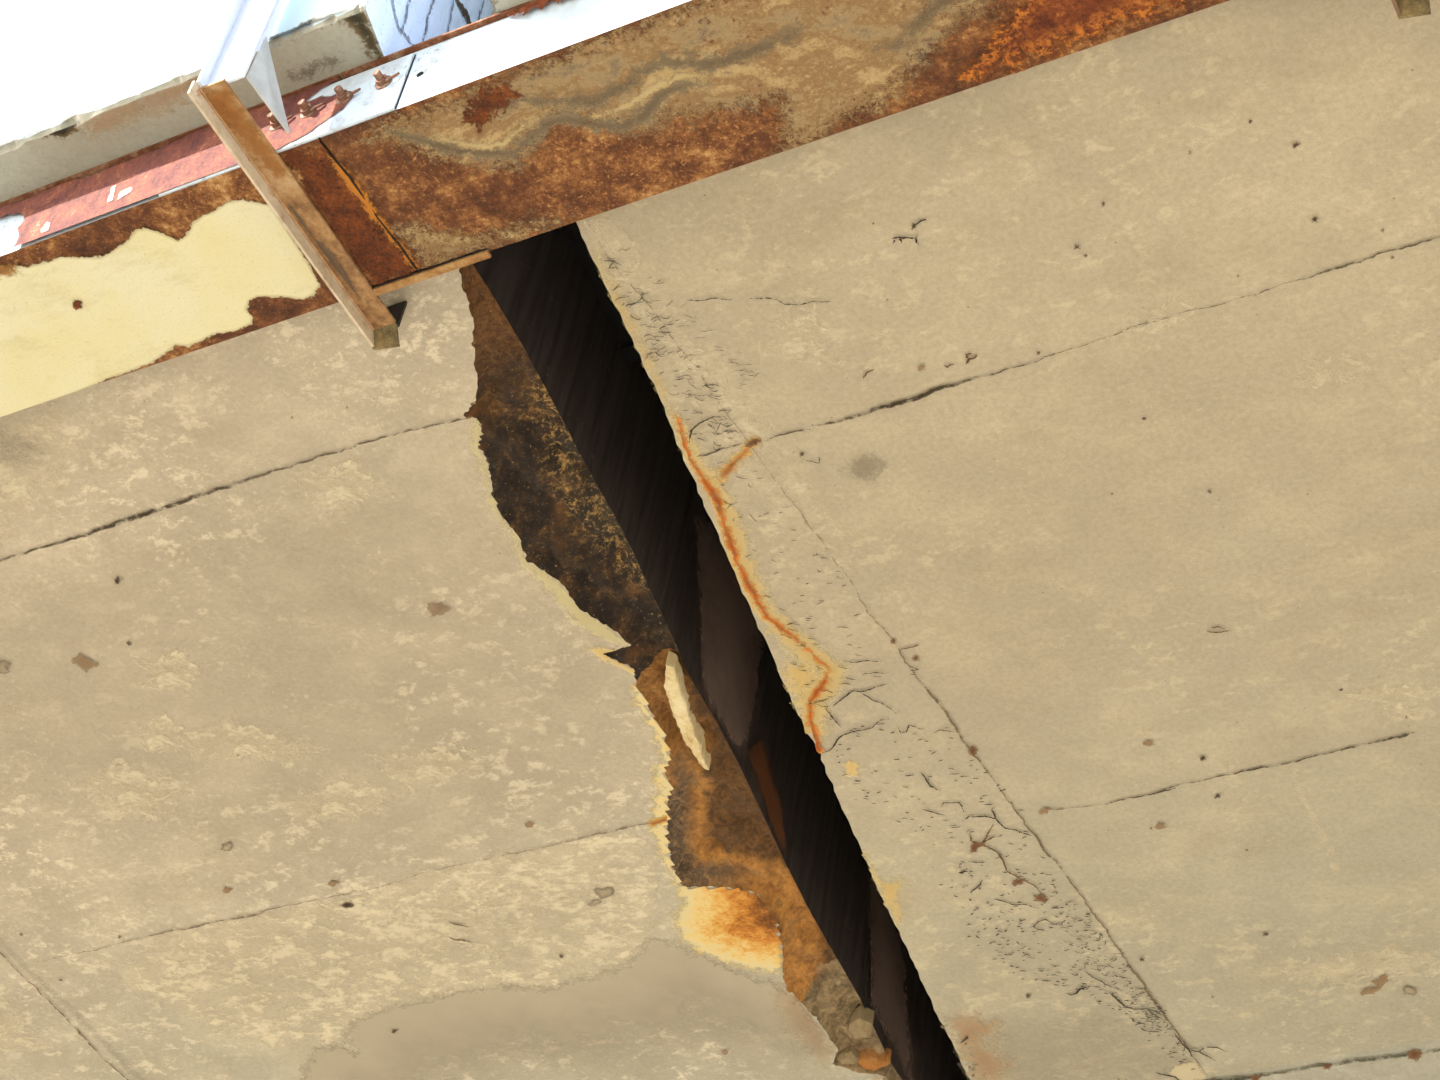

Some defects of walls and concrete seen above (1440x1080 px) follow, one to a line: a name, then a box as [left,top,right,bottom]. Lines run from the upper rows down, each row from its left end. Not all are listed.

peeling [0,199,321,417]
corrosion [0,77,419,287]
corrosion [459,80,525,134]
corrosion [507,0,564,16]
crack [892,219,926,245]
corrosion [957,0,1185,82]
spalling [459,264,902,1080]
corrosion [673,416,844,754]
crack [605,248,1224,1080]
damp [113,828,821,1080]